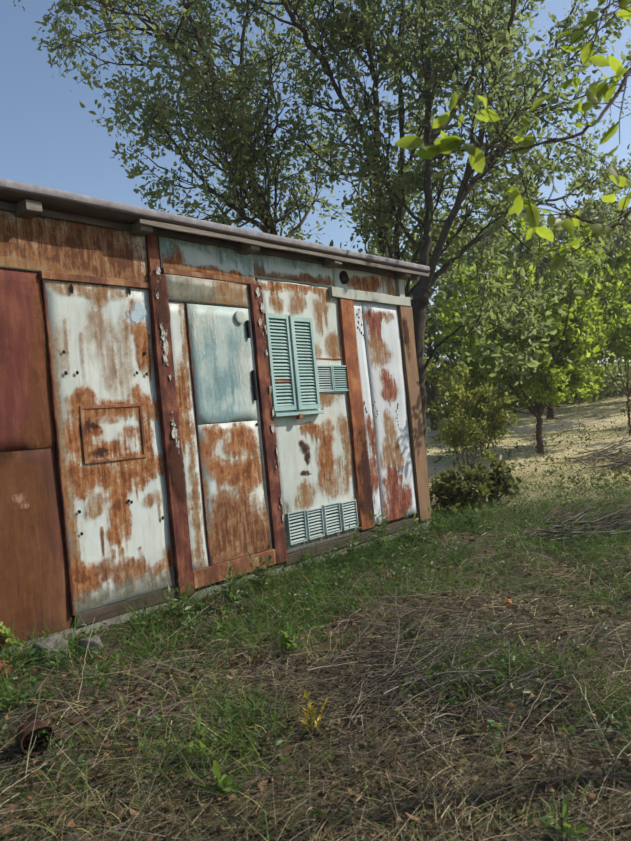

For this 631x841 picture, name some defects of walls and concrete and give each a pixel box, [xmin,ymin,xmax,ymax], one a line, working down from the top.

rust [346,275,397,296]
rust [0,212,343,606]
rust [364,309,398,402]
rust [295,411,412,523]